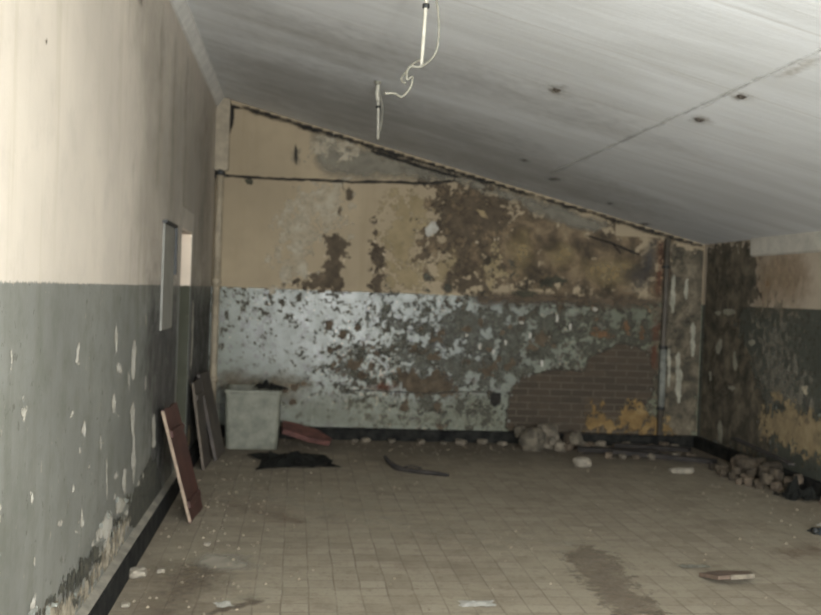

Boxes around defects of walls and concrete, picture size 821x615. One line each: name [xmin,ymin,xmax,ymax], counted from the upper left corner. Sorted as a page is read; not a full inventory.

peeling [114,325,136,389]
peeling [306,182,683,435]
leakage [401,170,799,458]
peeling [669,275,688,313]
flaking render [746,293,821,467]
peeling [28,402,144,615]